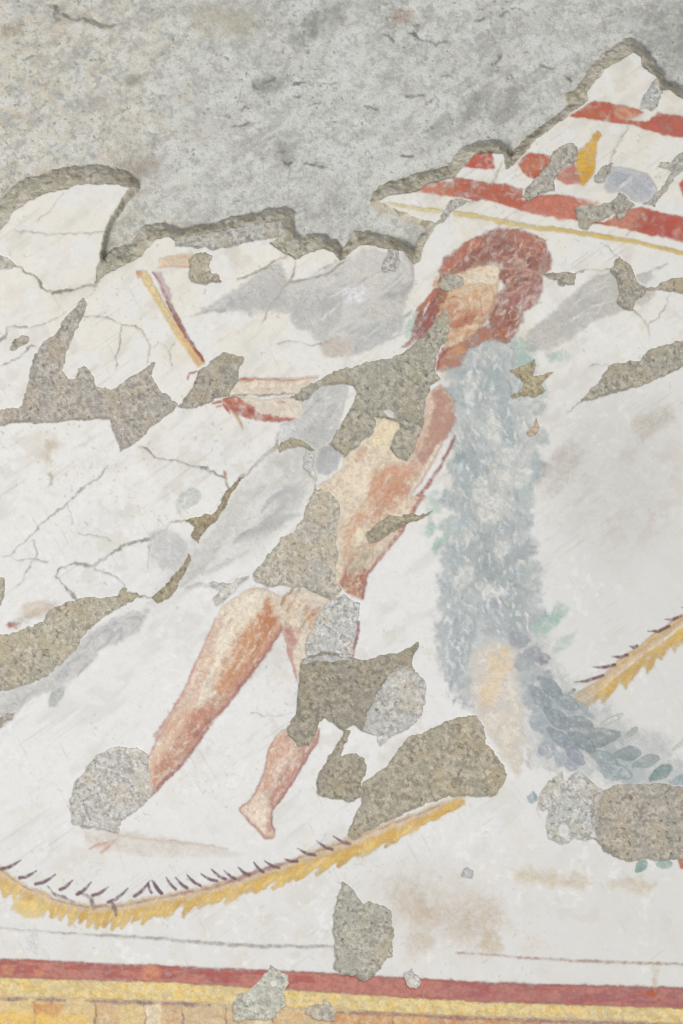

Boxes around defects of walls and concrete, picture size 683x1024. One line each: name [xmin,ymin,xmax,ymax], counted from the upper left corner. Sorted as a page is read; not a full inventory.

spalling [0,38,683,287]
crack [14,265,73,294]
spalling [610,256,683,311]
spalling [0,298,244,452]
spalling [290,308,450,460]
spalling [581,340,683,402]
crack [200,440,278,501]
spalling [0,553,191,691]
spalling [209,437,507,840]
spalling [69,746,153,833]
spalling [537,770,683,862]
spalling [332,882,394,982]